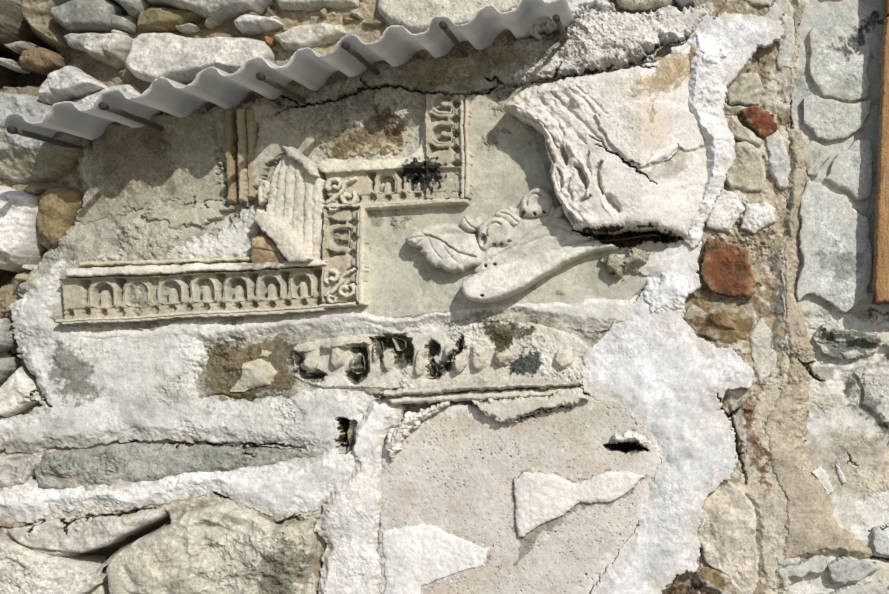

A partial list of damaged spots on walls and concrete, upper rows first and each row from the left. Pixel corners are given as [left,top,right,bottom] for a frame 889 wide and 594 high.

crack [276,39,687,116]
leakage [411,162,447,194]
crack [589,135,653,182]
spalling [638,143,688,179]
crack [717,393,747,483]
crack [0,507,146,535]
peeling [376,521,495,594]
peeling [511,468,647,564]